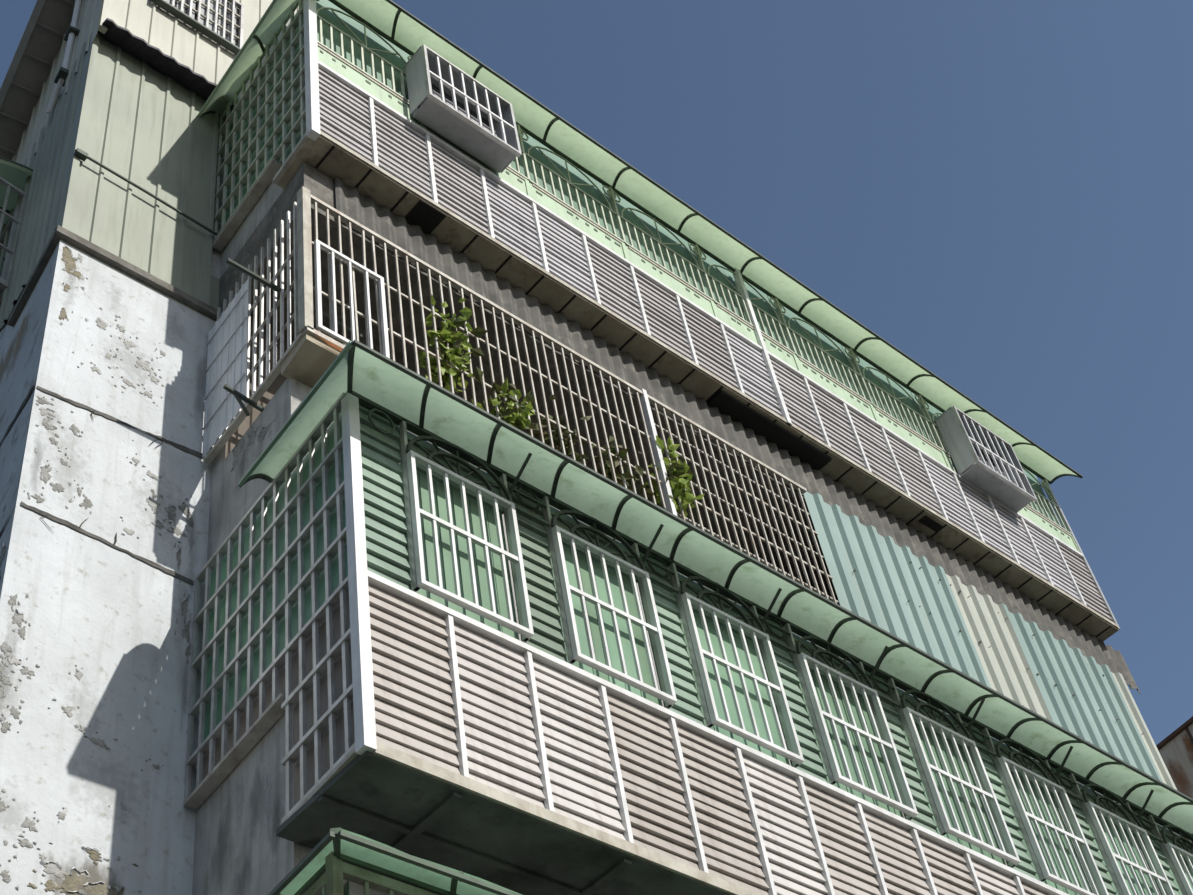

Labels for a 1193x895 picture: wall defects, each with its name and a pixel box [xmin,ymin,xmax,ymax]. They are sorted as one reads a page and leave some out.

peeling [62,245,88,292]
peeling [59,307,166,406]
peeling [24,395,93,514]
peeling [127,440,197,665]
peeling [0,594,40,733]
rust [1171,766,1186,787]
spalling [0,811,139,895]